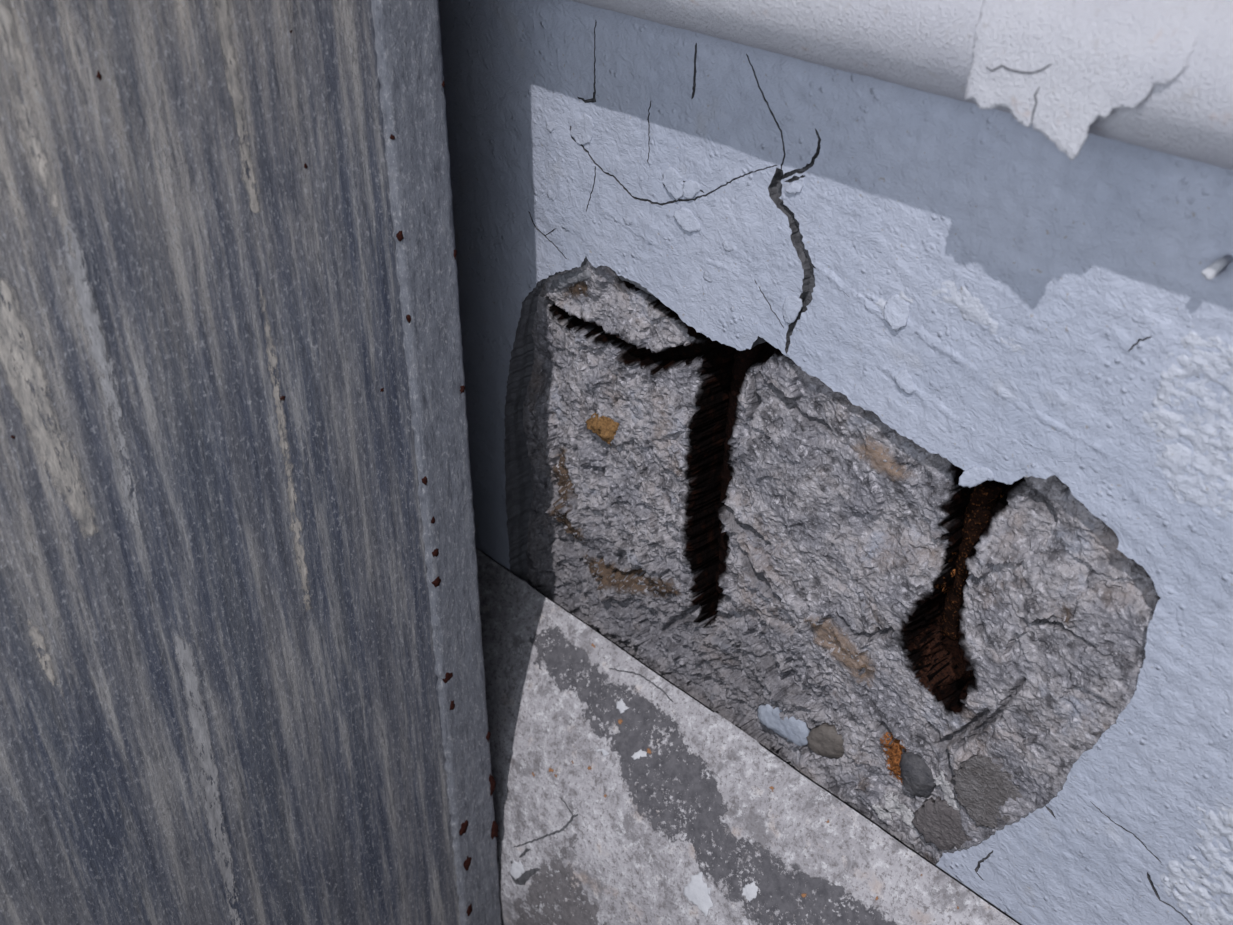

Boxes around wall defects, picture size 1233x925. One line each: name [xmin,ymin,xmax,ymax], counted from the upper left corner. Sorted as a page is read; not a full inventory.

peeling [964,0,1197,161]
crack [570,20,847,353]
peeling [1201,254,1233,280]
spalling [504,257,1161,865]
corrosion [912,616,973,694]